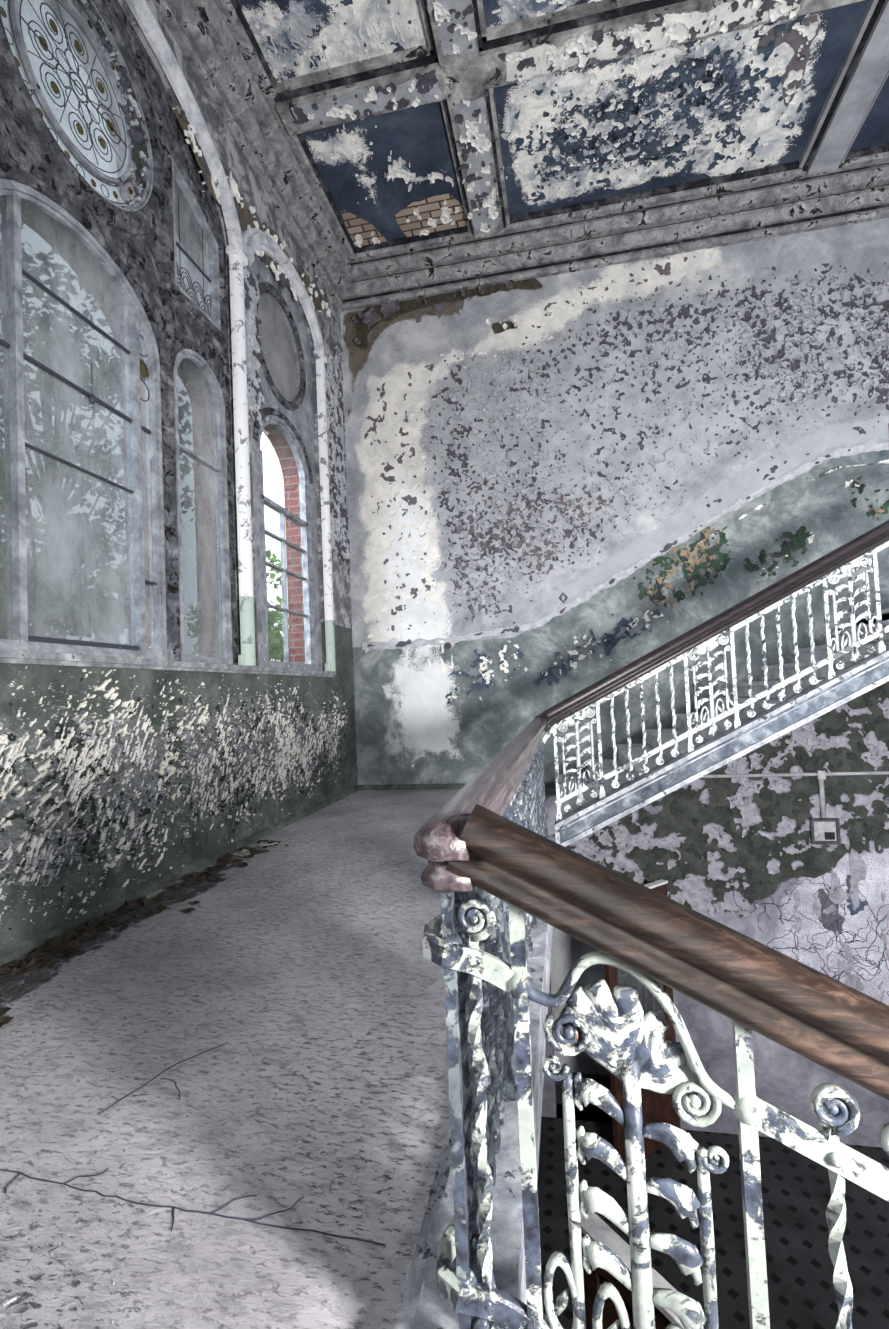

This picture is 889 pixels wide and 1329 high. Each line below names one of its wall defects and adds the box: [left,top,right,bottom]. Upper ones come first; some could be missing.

peeling [427,0,477,56]
peeling [498,0,820,107]
flaking render [168,100,335,435]
spalling [341,210,387,248]
spalling [291,70,501,237]
flaking render [325,278,543,575]
peeling [362,262,889,704]
peeling [554,681,889,937]
crack [97,1043,227,1115]
crack [0,1168,386,1246]